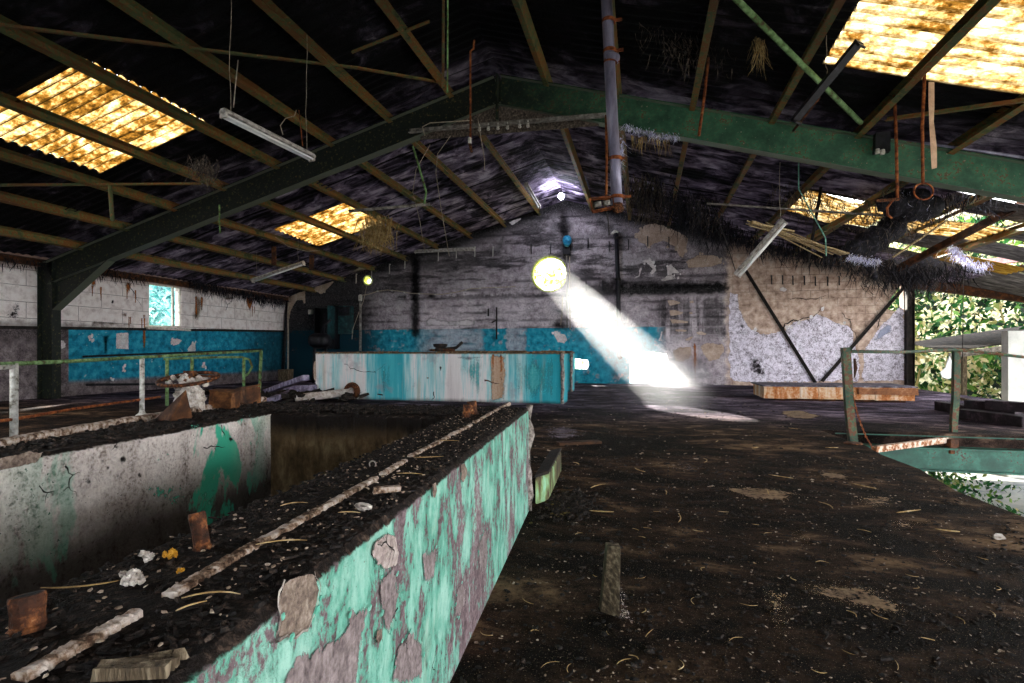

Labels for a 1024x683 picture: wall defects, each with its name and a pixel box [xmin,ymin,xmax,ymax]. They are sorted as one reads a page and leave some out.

flaking render [634,223,724,281]
peeling [170,338,196,352]
flaking render [668,300,724,362]
spalling [354,502,372,512]
peeling [423,545,441,585]
peeling [285,568,425,683]